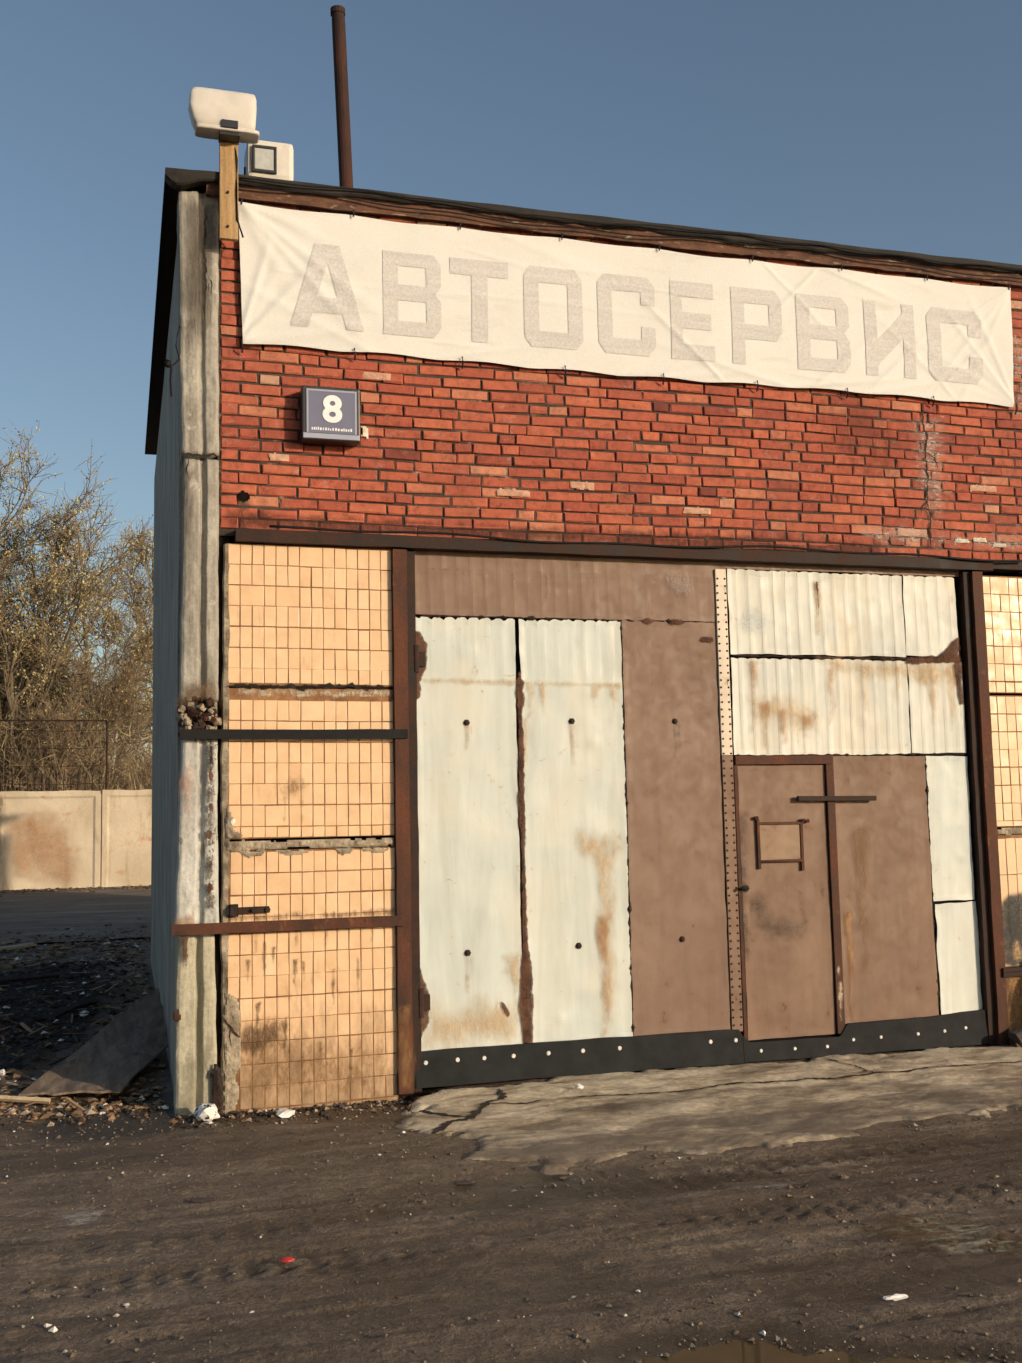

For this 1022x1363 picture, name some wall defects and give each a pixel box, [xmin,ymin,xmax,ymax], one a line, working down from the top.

crack [920,404,938,548]
peeling [243,689,389,697]
rust [883,638,964,705]
spalling [204,742,394,909]
rust [436,671,534,1043]
crack [418,1057,1021,1134]